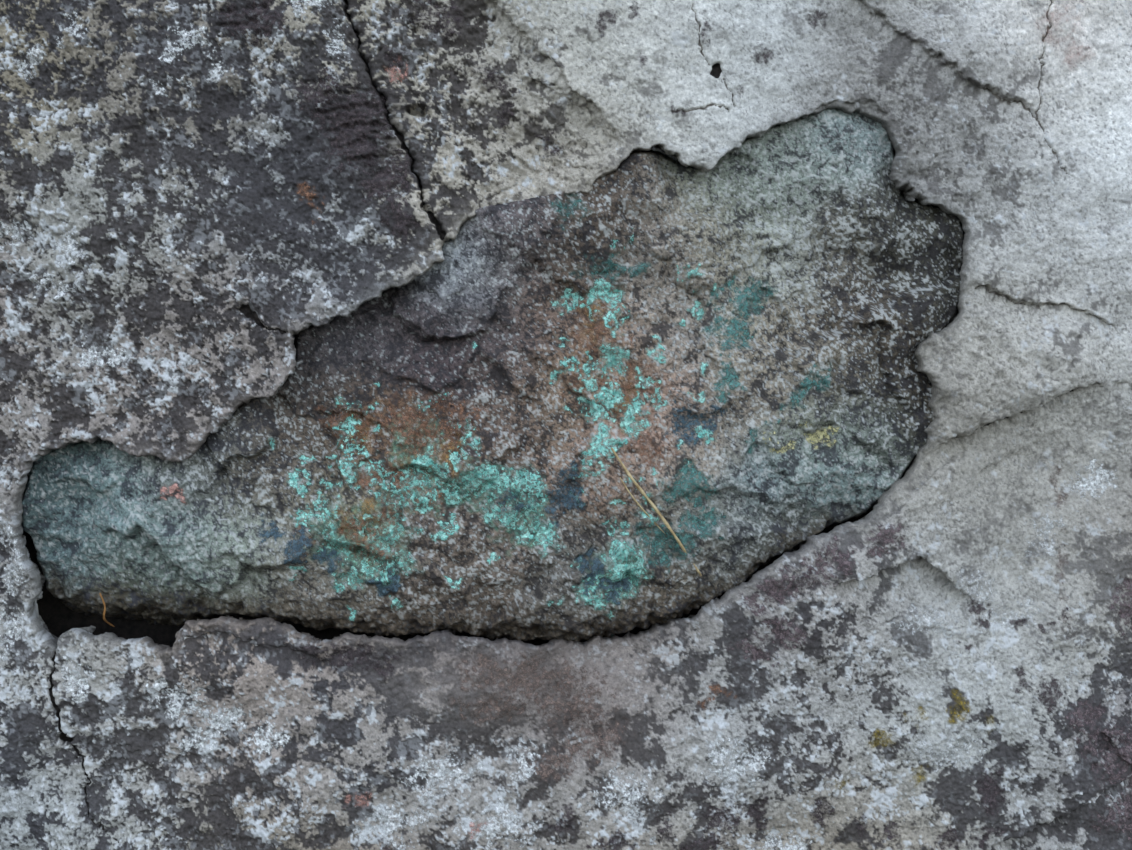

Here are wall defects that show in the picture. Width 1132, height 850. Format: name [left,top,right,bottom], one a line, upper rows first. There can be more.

crack [343,0,446,240]
crack [672,4,735,113]
crack [979,0,1069,175]
flaking render [0,0,1132,663]
rust [559,302,677,471]
crack [975,286,1110,325]
rust [315,392,481,559]